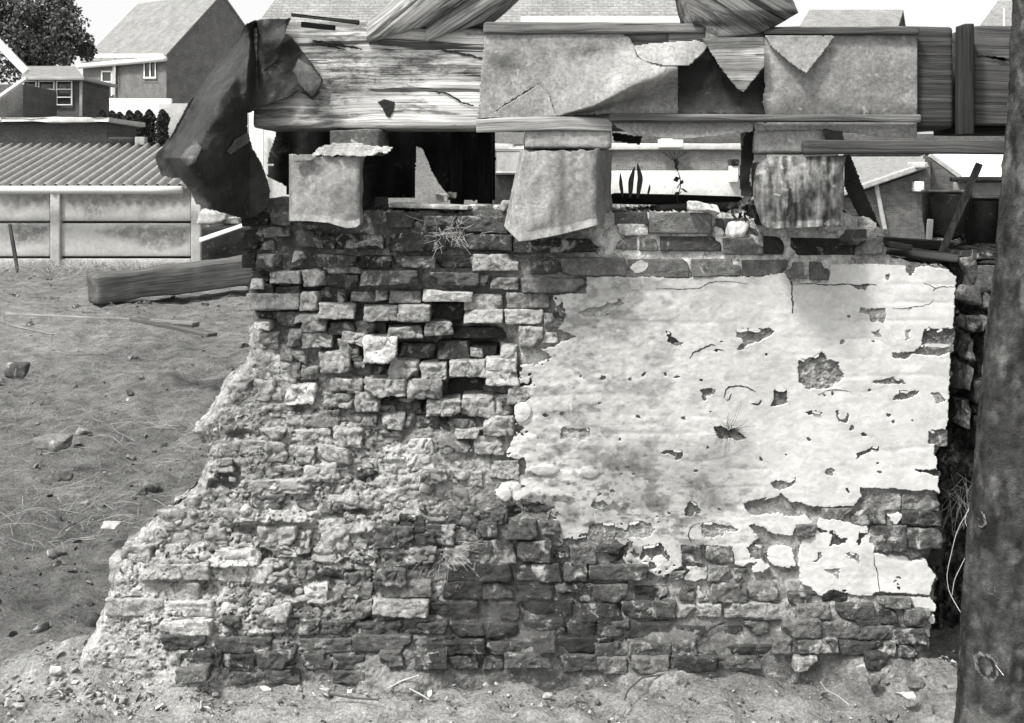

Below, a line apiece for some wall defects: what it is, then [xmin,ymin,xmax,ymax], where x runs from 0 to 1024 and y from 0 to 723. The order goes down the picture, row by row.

crack [655,281,748,290]
crack [791,281,876,313]
spalling [736,328,774,350]
peeling [847,307,886,342]
spalling [892,328,955,359]
spalling [797,352,843,396]
spalling [771,389,787,406]
spalling [868,377,945,404]
spalling [928,429,947,446]
spalling [685,501,738,538]
spalling [587,512,671,561]
flaking render [814,528,869,580]